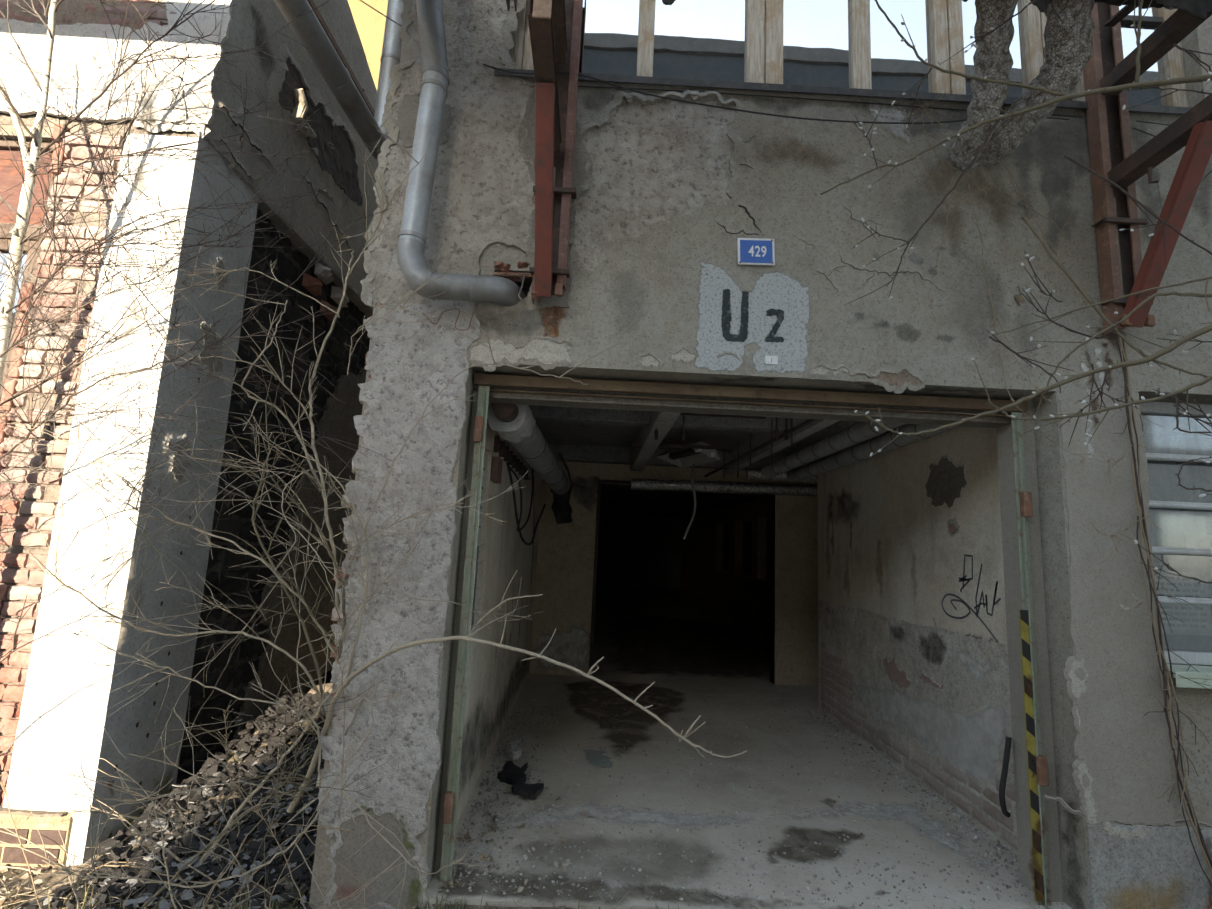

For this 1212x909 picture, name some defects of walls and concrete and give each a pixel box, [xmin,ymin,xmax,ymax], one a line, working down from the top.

flaking render [0,0,177,29]
spalling [267,0,427,321]
spalling [424,0,535,316]
spalling [925,455,968,537]
spalling [330,607,345,658]
leakage [459,589,770,789]
leakage [769,827,861,863]